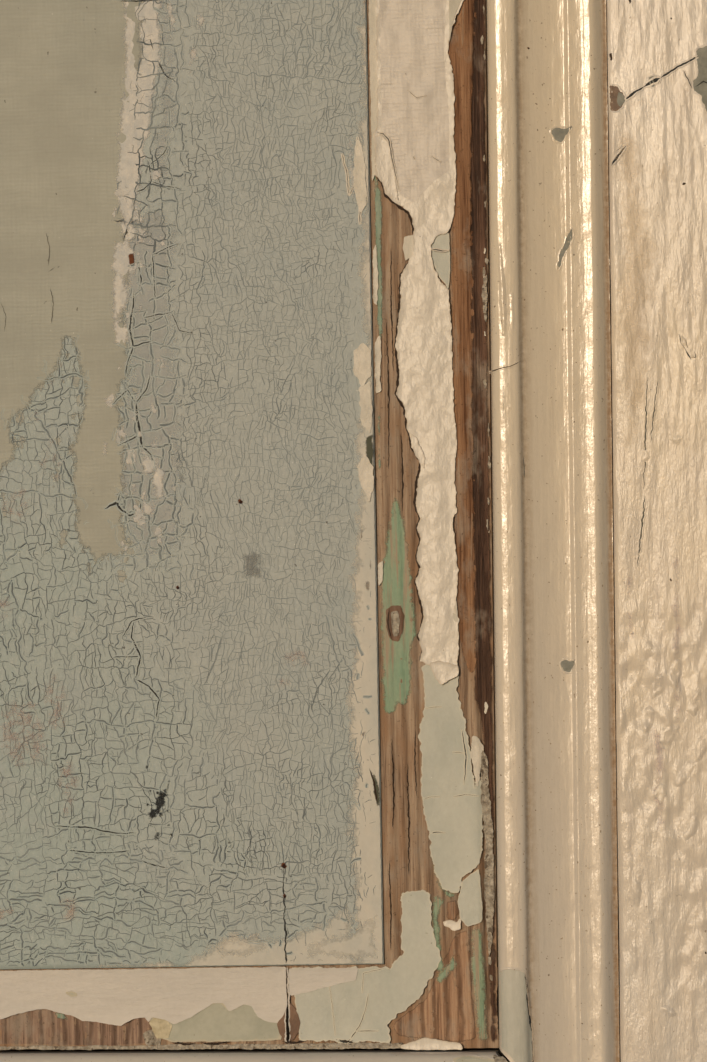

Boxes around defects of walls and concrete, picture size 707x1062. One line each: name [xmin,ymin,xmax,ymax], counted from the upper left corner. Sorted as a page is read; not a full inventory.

crack [625,55,699,101]
crack [341,137,362,225]
crack [46,234,54,322]
crack [111,243,191,471]
crack [104,491,143,518]
peeling [0,0,535,1062]
crack [113,616,161,719]
crack [55,824,168,870]
crack [283,869,291,1042]